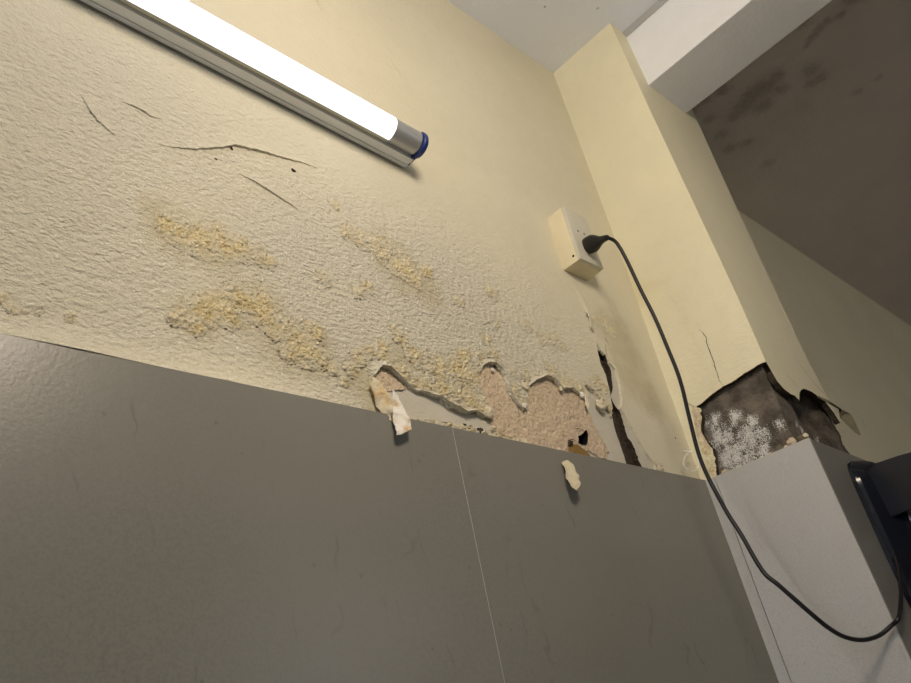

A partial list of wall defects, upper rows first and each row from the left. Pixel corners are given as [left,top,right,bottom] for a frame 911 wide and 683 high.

peeling [340,311,664,491]
spalling [682,362,861,474]